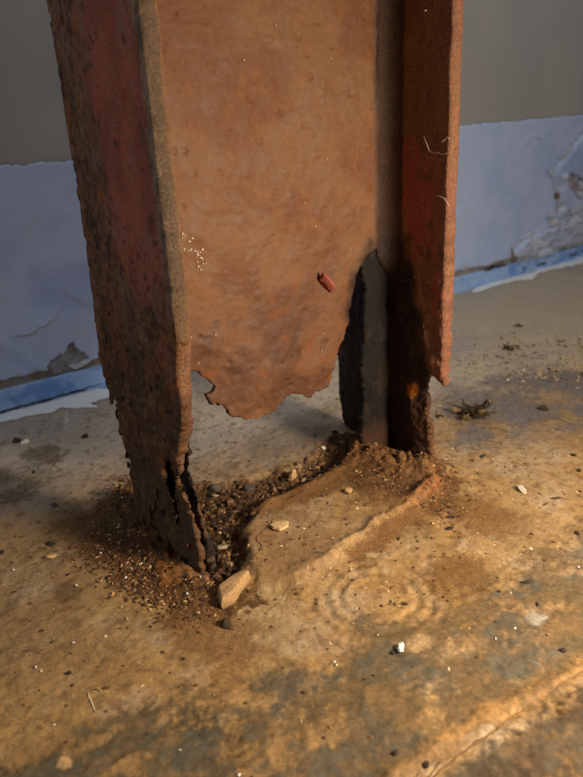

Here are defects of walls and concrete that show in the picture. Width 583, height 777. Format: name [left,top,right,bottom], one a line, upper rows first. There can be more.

flaking render [560,173,583,202]
flaking render [46,342,91,374]
corrosion [253,441,523,562]
damp [217,585,290,646]
damp [231,539,583,777]
damp [0,680,238,777]
crack [415,671,583,777]